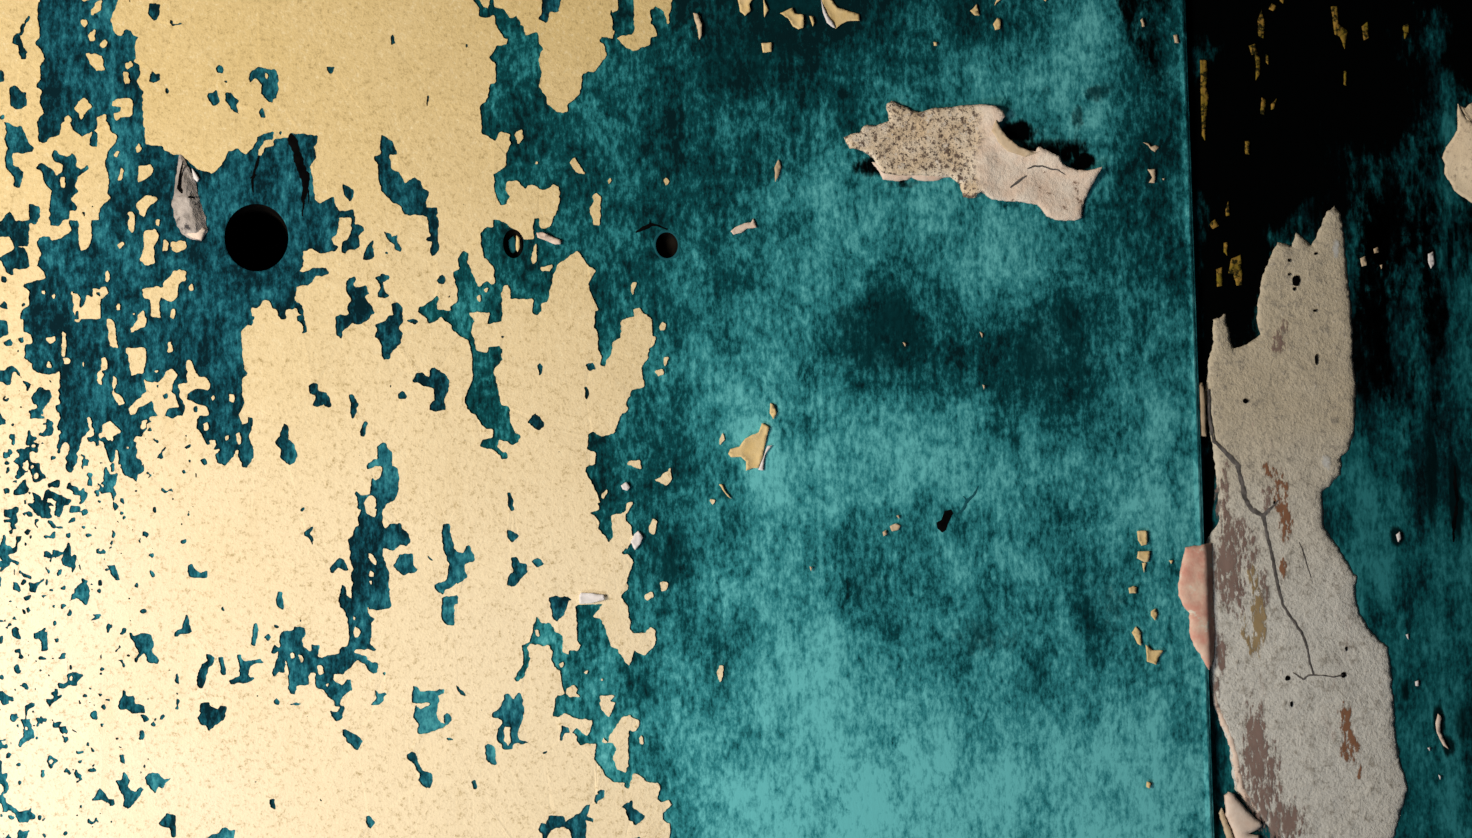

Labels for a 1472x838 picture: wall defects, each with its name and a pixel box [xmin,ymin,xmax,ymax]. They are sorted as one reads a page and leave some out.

peeling [1249,0,1284,79]
peeling [1331,6,1369,49]
peeling [1200,60,1209,140]
peeling [1260,98,1277,115]
peeling [844,101,1102,221]
peeling [1442,103,1472,203]
peeling [0,0,672,838]
peeling [1129,531,1150,593]
crack [1207,389,1342,680]
spalling [1169,203,1408,838]
peeling [1132,627,1163,665]